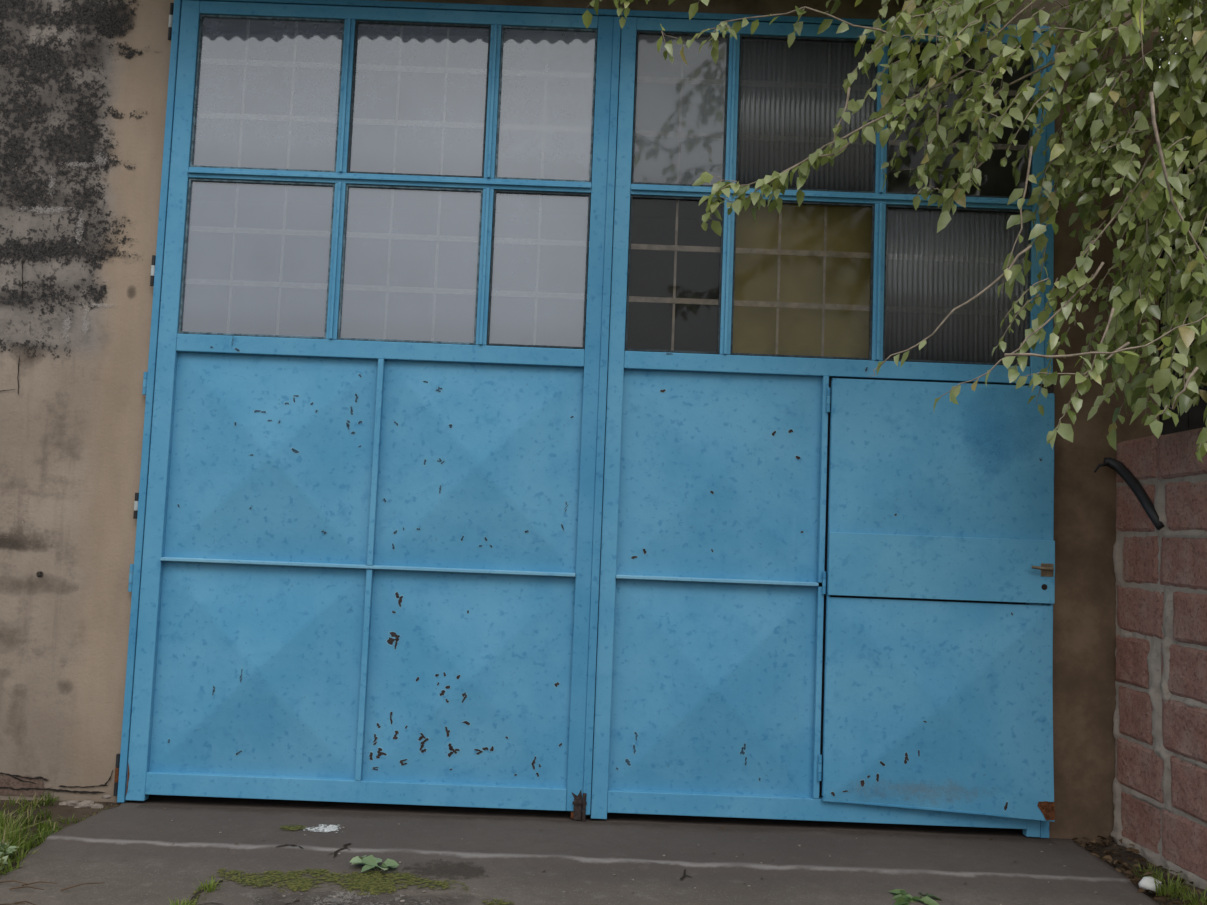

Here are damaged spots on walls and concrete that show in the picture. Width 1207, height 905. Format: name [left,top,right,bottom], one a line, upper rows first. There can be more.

leakage [0,0,147,320]
leakage [0,339,71,359]
leakage [0,535,40,549]
spalling [0,774,51,797]
rust [1037,801,1055,820]